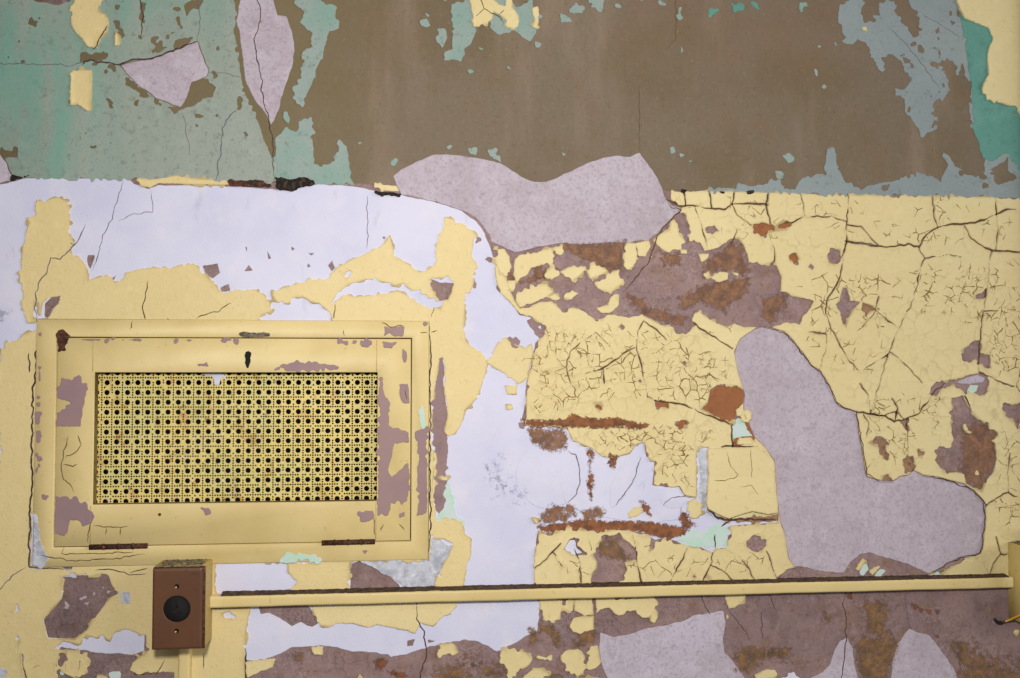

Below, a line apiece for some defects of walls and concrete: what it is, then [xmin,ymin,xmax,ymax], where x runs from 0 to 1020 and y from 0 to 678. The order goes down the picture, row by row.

peeling [34,0,121,48]
peeling [69,66,92,111]
flaking render [122,42,208,107]
flaking render [236,0,294,124]
peeling [420,0,542,74]
peeling [560,0,621,23]
peeling [0,145,1020,678]
rust [520,413,649,452]
crack [623,192,1020,573]
rust [537,449,695,562]
crack [521,322,777,640]
crack [416,603,427,678]